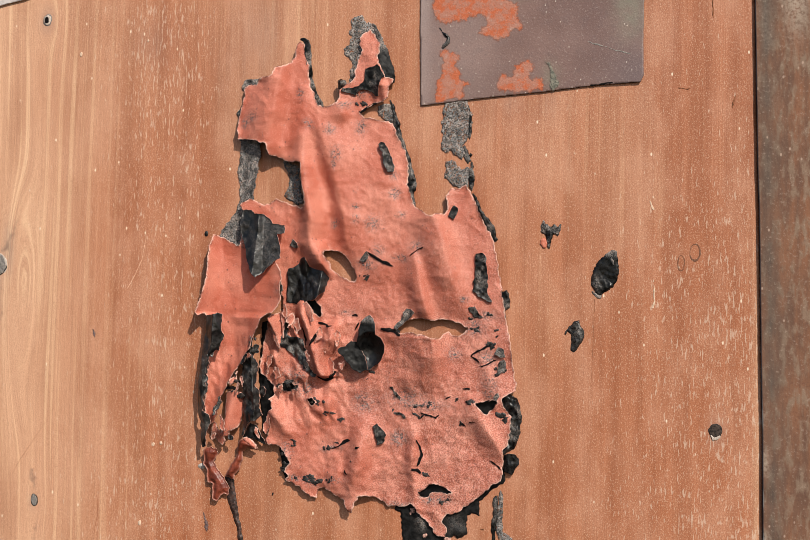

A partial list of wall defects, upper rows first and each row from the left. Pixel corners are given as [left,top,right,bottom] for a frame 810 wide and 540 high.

peeling [195,15,522,540]